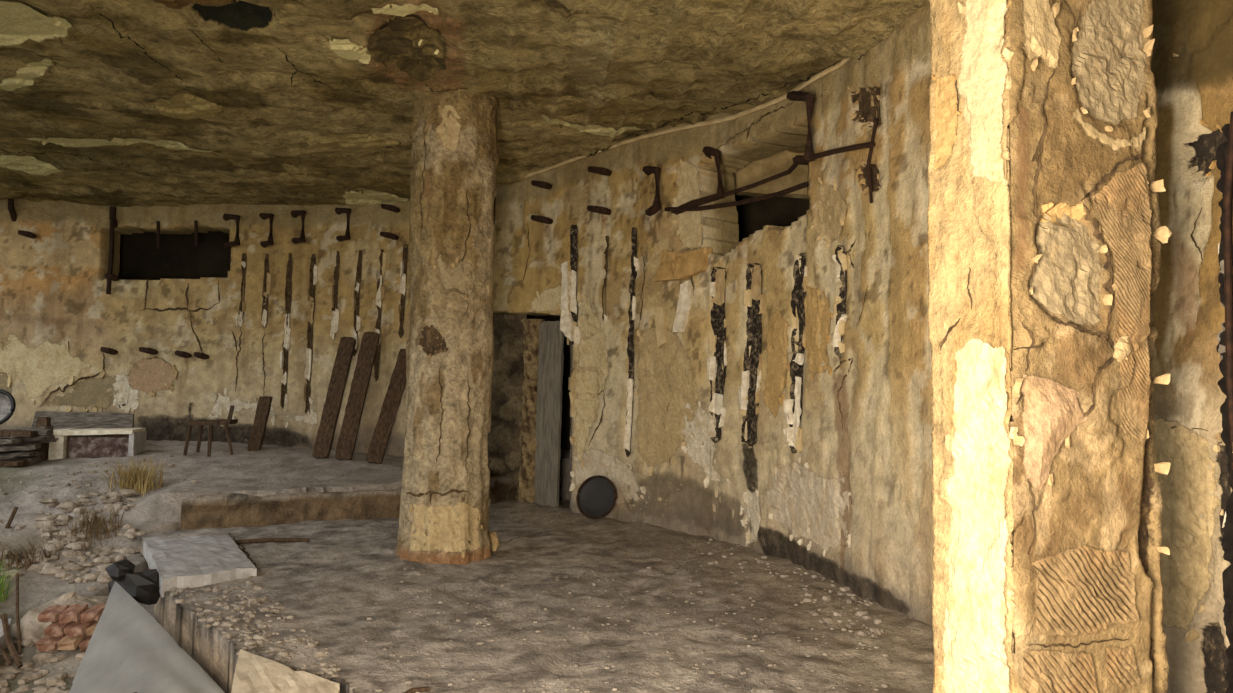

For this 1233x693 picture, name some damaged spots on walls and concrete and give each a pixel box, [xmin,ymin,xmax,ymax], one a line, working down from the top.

crack [1064,0,1076,43]
spalling [847,85,882,130]
peeling [931,0,1155,185]
spalling [1029,202,1113,325]
crack [1014,68,1143,417]
spalling [1147,179,1166,192]
spalling [1150,208,1172,243]
spalling [1184,119,1227,177]
peeling [0,334,178,414]
peeling [531,257,852,556]
spalling [1153,374,1170,385]
peeling [1138,417,1233,693]